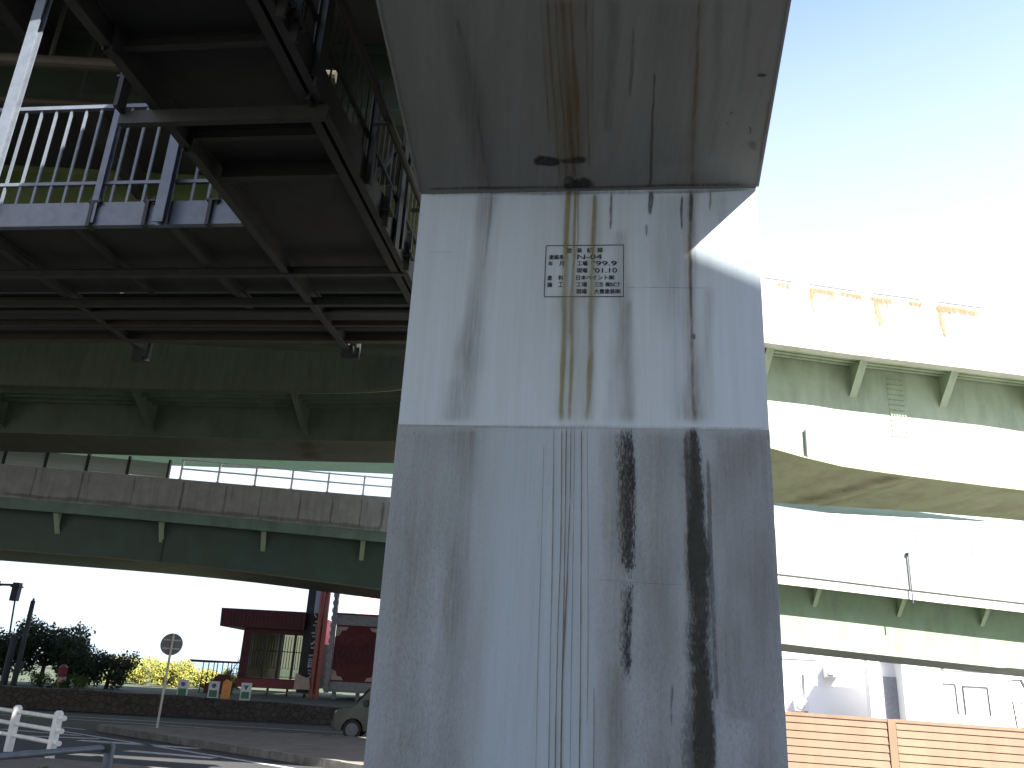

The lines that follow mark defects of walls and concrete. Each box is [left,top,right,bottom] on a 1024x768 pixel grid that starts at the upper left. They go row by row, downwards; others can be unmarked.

corrosion [564,193,576,270]
corrosion [560,298,573,414]
corrosion [808,287,980,336]
damp [618,430,637,678]
damp [684,429,718,768]